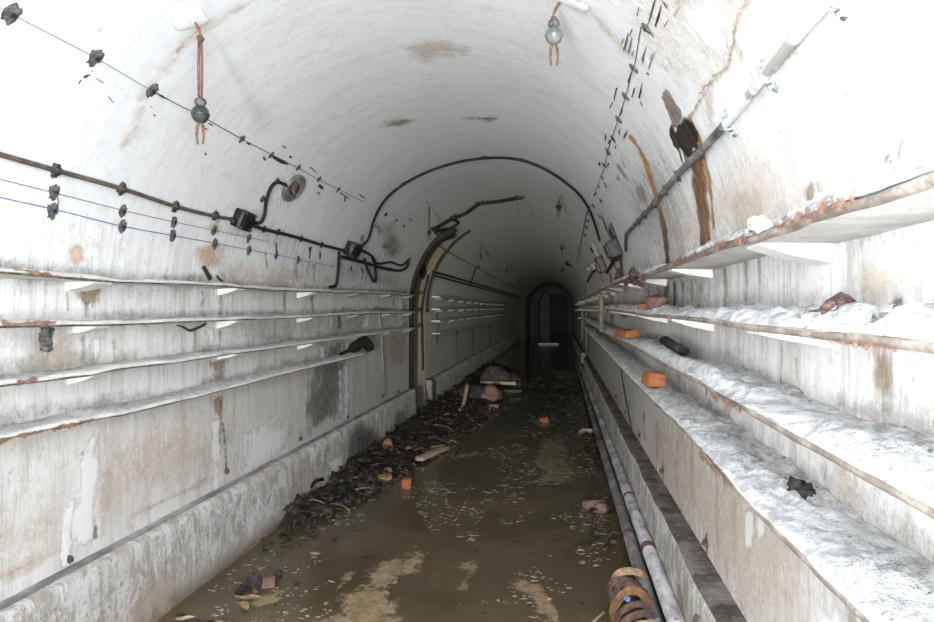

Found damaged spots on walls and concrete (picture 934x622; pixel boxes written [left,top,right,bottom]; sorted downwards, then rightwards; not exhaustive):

crack [689,0,751,117]
corrosion [629,136,745,268]
corrosion [688,117,714,228]
corrosion [773,184,855,231]
damp [306,316,350,428]
damp [328,424,377,480]